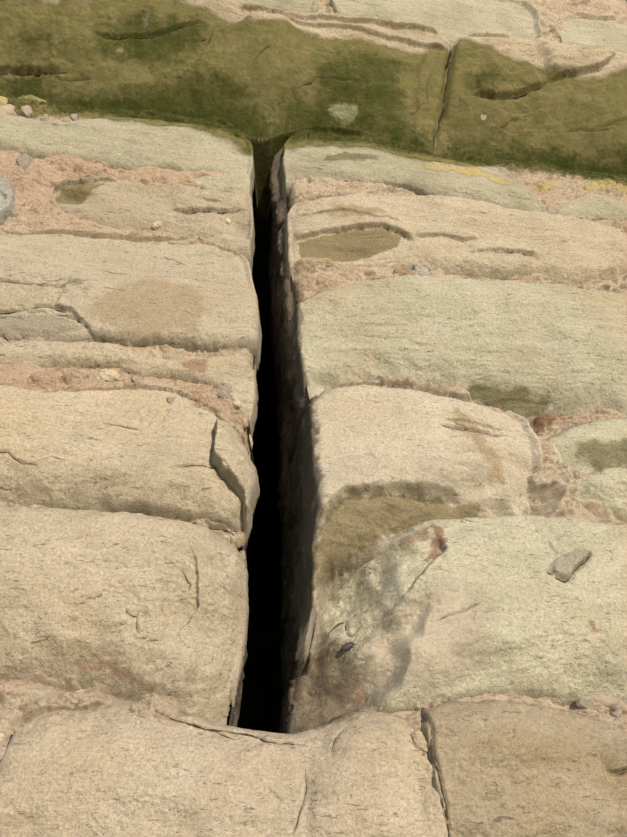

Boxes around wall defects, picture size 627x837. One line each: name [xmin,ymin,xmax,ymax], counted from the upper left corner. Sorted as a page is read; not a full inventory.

crack [405,50,452,151]